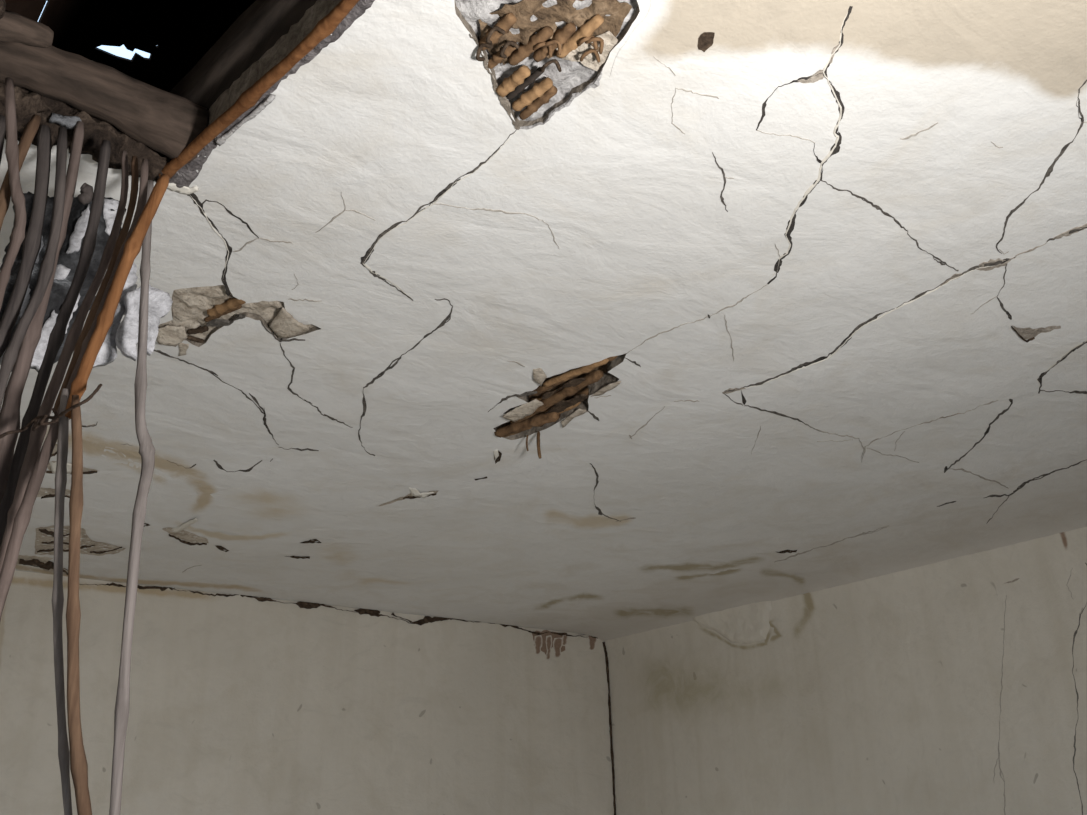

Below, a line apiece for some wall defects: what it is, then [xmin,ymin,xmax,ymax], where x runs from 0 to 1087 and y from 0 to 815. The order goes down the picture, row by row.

spalling [455,0,638,130]
leakage [610,0,1087,106]
spalling [157,285,316,356]
crack [187,193,292,296]
crack [280,129,559,456]
crack [627,6,1087,523]
spalling [488,356,641,464]
peeling [17,525,126,575]
leakage [41,414,453,588]
crack [79,565,616,815]
rust [532,630,568,660]
leakage [625,553,821,743]